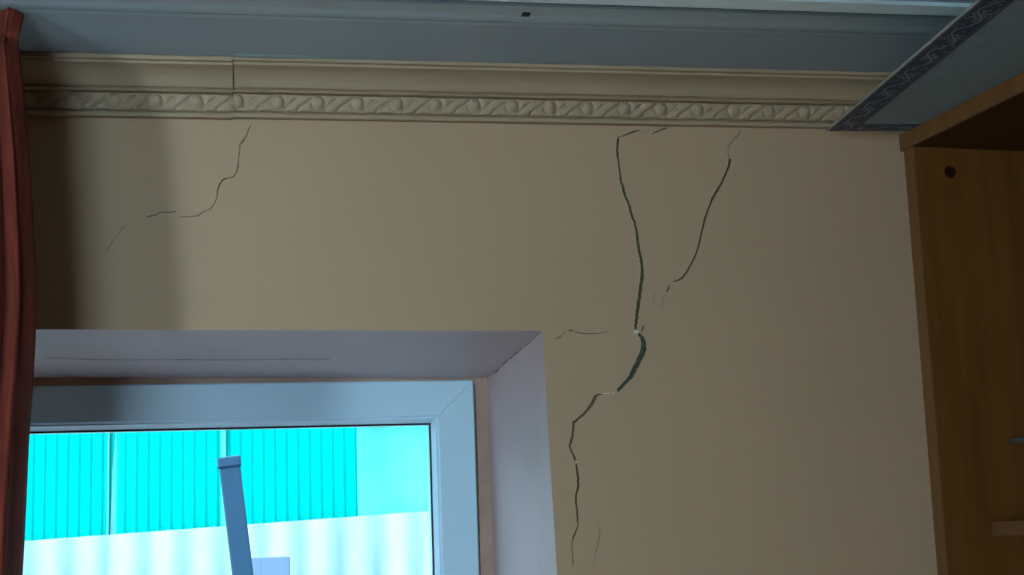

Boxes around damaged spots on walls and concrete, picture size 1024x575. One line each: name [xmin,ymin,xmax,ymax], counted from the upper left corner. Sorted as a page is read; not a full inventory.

crack [148,125,251,217]
crack [667,158,731,292]
crack [569,126,673,562]